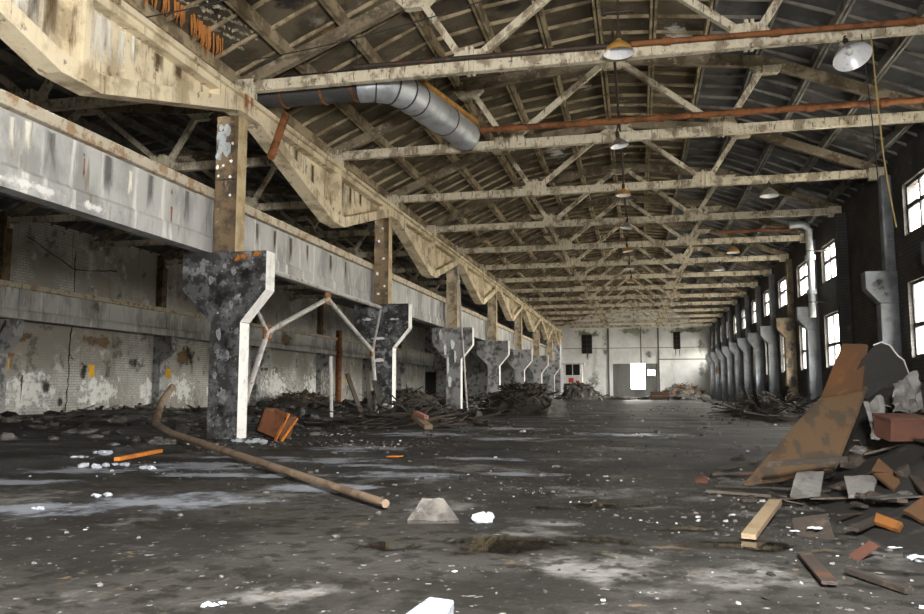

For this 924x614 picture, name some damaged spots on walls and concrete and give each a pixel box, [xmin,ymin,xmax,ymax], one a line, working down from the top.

rust [141,0,223,60]
water stain [24,120,32,148]
peeling [215,124,234,178]
crack [65,326,74,411]
peeling [5,367,152,413]
peeling [168,371,217,408]
peeling [260,366,329,401]